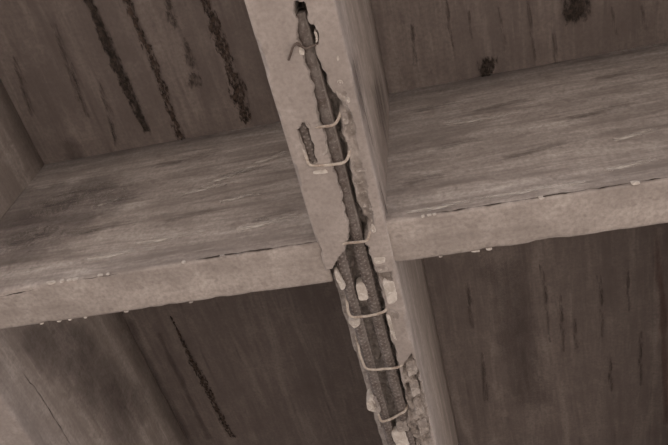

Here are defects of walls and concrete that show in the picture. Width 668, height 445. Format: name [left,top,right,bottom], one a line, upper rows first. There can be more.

damp [84,0,149,132]
damp [122,0,185,140]
damp [200,0,251,124]
mould [480,57,497,77]
mould [563,0,590,22]
spalling [292,0,432,445]
damp [170,316,236,438]